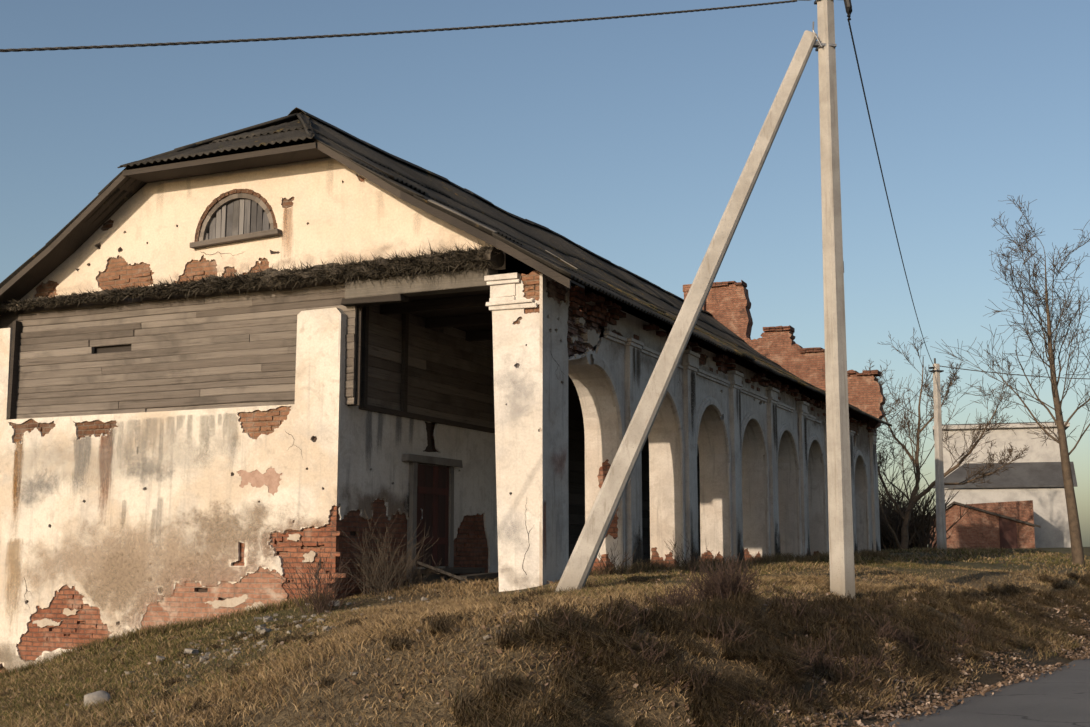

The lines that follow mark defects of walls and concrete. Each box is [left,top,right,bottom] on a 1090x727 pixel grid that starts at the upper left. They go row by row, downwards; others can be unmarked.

flaking render [78,248,154,290]
flaking render [175,250,280,284]
flaking render [34,280,59,298]
flaking render [567,317,621,347]
flaking render [239,406,291,440]
flaking render [233,467,282,496]
flaking render [597,459,611,488]
flaking render [605,508,618,539]
flaking render [454,514,488,575]
damp [34,509,265,619]
flaking render [141,499,409,630]
flaking render [17,585,120,661]